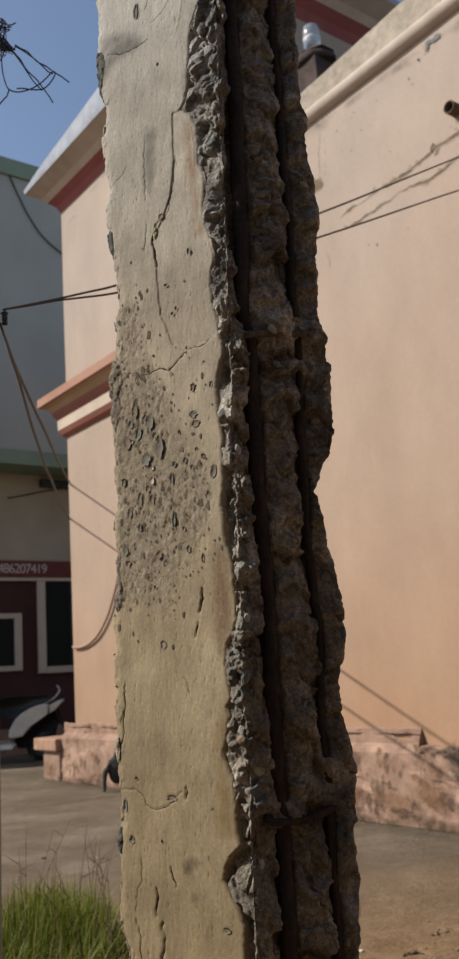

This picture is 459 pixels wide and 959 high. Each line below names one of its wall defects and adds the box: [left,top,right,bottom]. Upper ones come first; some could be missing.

crack [144,159,176,264]
crack [341,131,459,226]
crack [129,333,216,377]
spalling [108,0,361,959]
water stain [355,745,459,834]
crack [136,867,177,959]